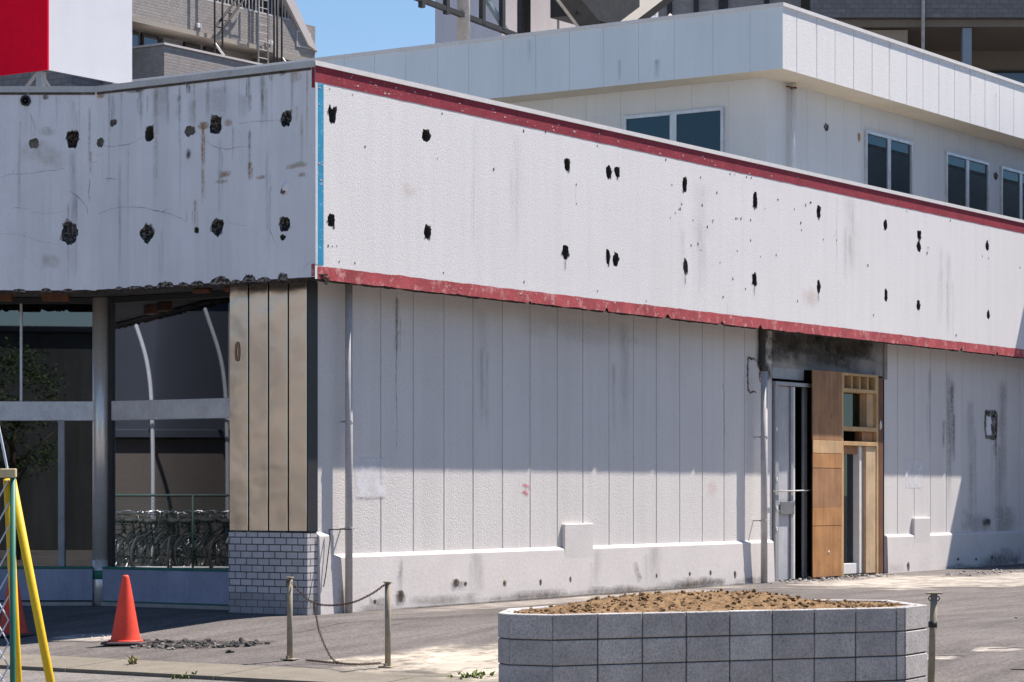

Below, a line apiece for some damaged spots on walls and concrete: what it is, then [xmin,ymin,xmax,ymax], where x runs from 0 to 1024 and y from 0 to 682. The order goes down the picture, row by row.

hole [209,114,222,134]
hole [280,109,292,127]
spalling [319,103,337,124]
hole [65,130,80,149]
hole [606,165,620,180]
hole [60,218,78,245]
hole [140,223,155,244]
hole [194,217,224,237]
hole [278,216,291,241]
spalling [0,272,1024,359]